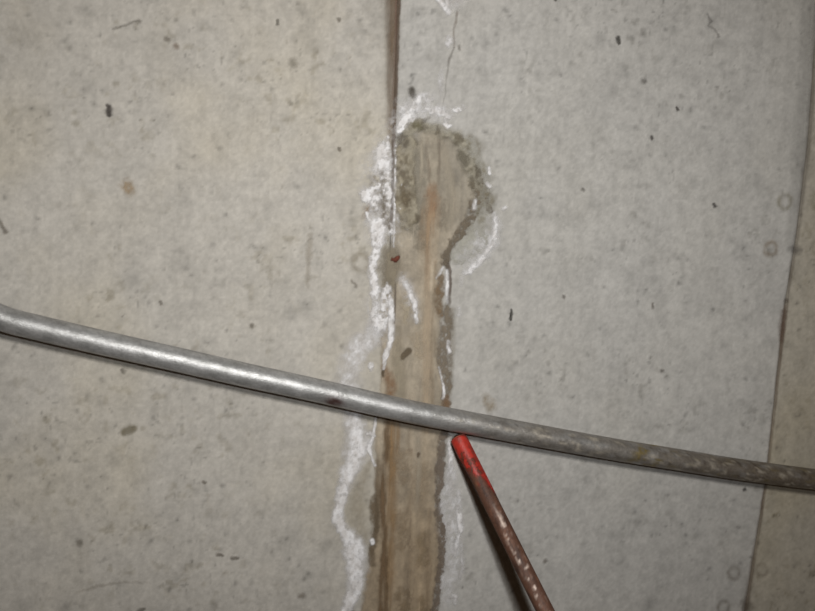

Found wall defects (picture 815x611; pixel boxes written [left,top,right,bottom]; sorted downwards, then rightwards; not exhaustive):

damp [341,94,507,406]
damp [332,409,463,611]